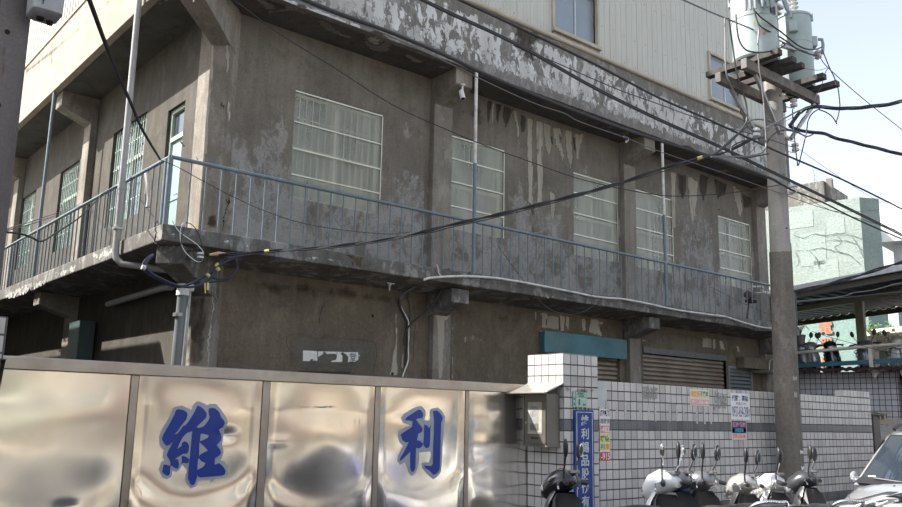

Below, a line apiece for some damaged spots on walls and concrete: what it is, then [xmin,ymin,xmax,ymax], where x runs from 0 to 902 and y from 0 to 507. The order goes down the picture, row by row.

peeling [284,0,767,171]
leakage [477,101,583,239]
crack [207,289,215,366]